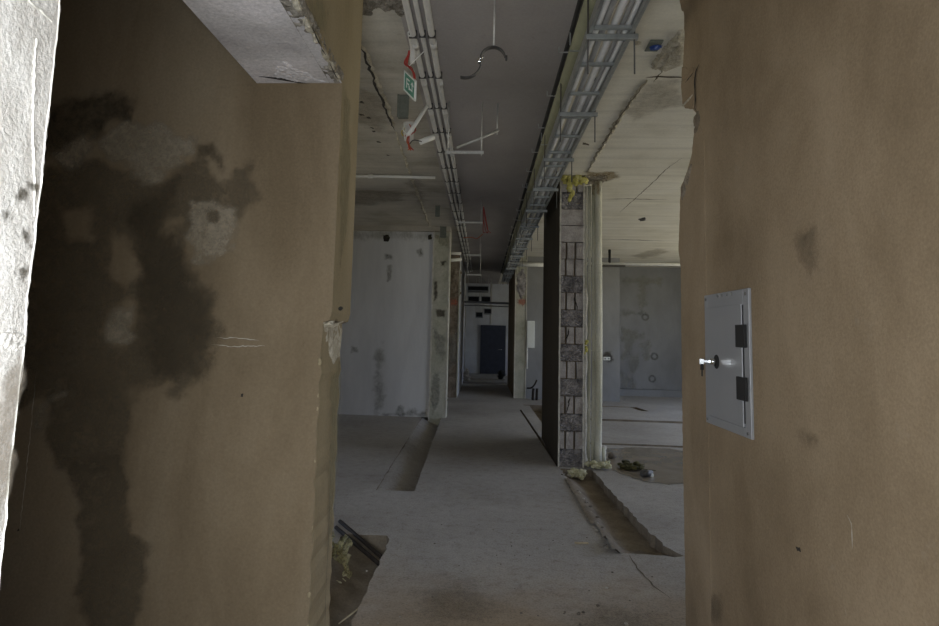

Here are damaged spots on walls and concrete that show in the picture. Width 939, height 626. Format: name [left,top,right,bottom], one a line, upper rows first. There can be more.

spalling [274,0,344,83]
water stain [45,93,131,153]
crack [361,47,394,128]
spalling [323,320,344,364]
water stain [0,146,257,626]